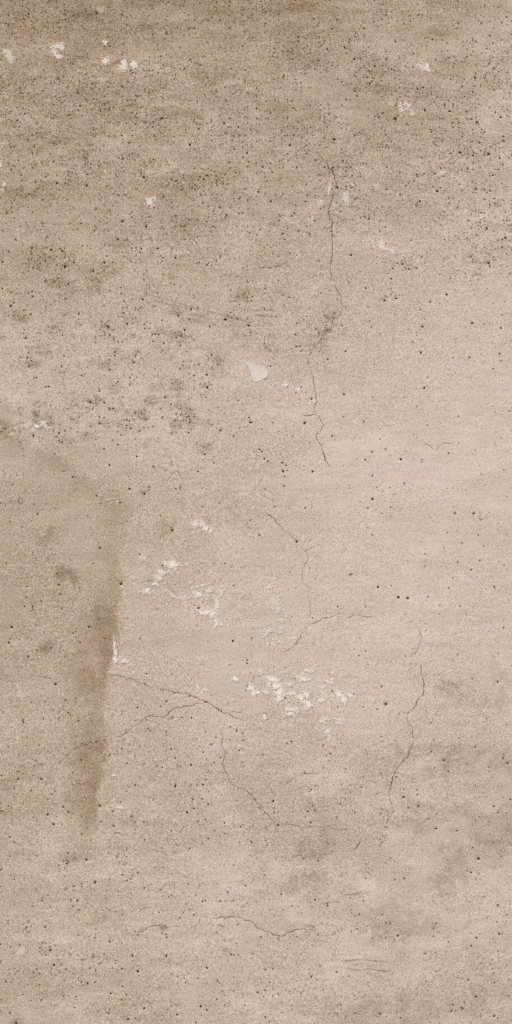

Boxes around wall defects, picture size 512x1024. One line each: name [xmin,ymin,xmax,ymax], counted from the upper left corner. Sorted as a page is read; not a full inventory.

crack [303,154,344,464]
crack [32,629,424,849]